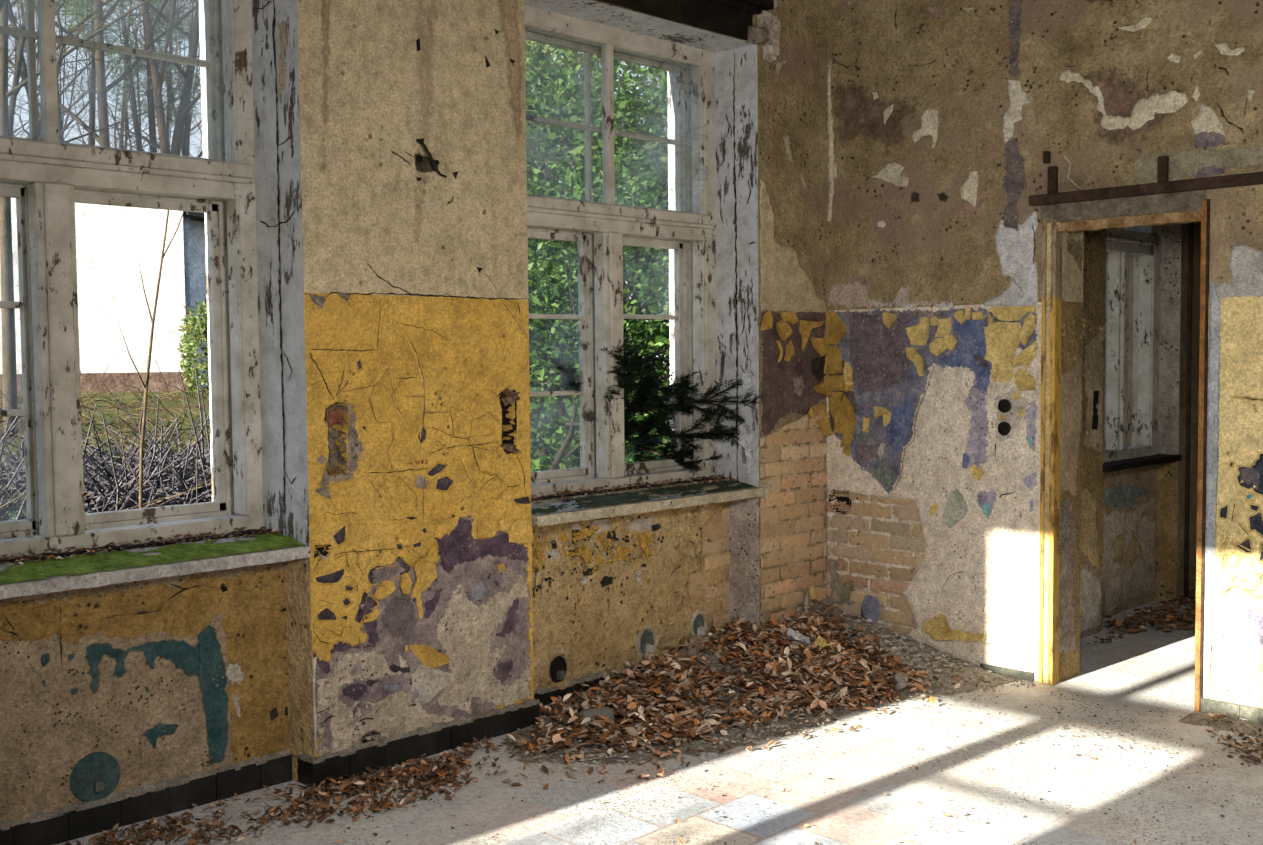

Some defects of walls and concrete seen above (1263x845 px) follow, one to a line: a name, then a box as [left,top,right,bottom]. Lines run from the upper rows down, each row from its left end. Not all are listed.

crack [254,0,529,644]
spalling [315,400,367,498]
peeling [740,306,1038,642]
peeling [1218,504,1230,520]
crack [1218,504,1263,601]
peeling [1225,443,1263,578]
crack [1231,395,1263,413]
peeling [312,494,663,756]
peeling [1211,599,1263,709]